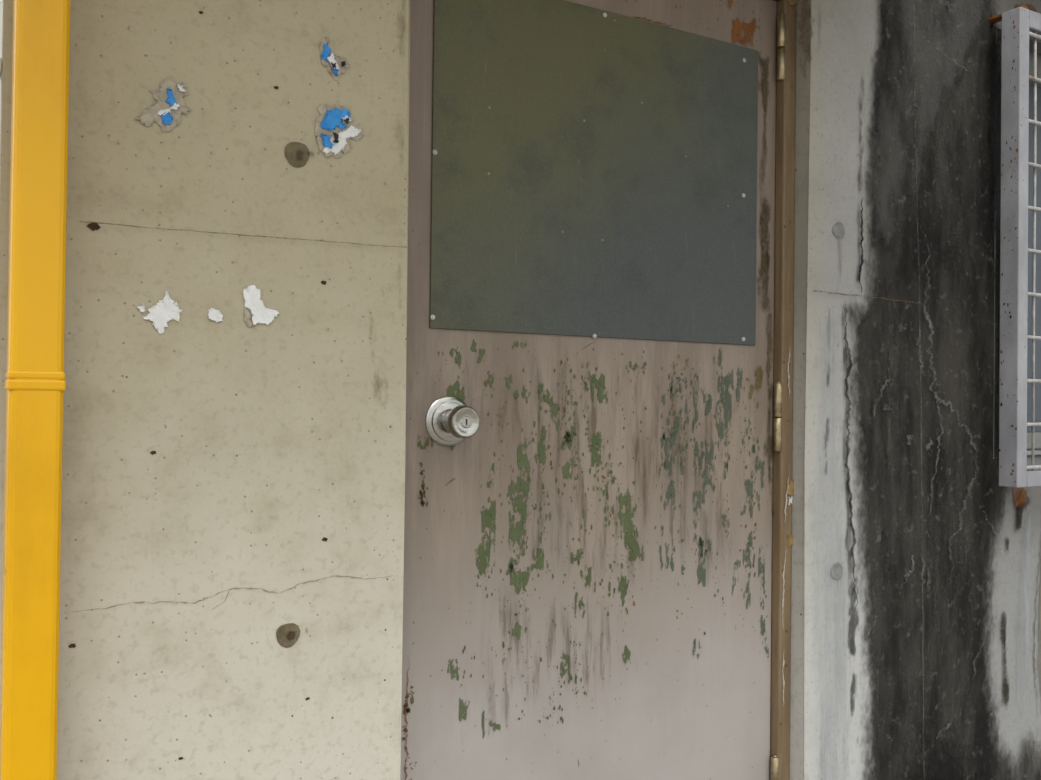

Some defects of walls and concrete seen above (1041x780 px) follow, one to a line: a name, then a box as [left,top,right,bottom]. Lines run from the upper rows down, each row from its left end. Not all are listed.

corrosion [729,0,756,45]
damp [797,0,812,57]
peeling [321,42,346,76]
peeling [157,84,186,125]
peeling [319,107,361,155]
peeling [137,291,182,334]
peeling [208,308,223,324]
peeling [243,285,279,325]
damp [843,0,1041,780]
peeling [419,462,428,507]
peeling [435,201,794,738]
corrosion [1001,463,1027,528]